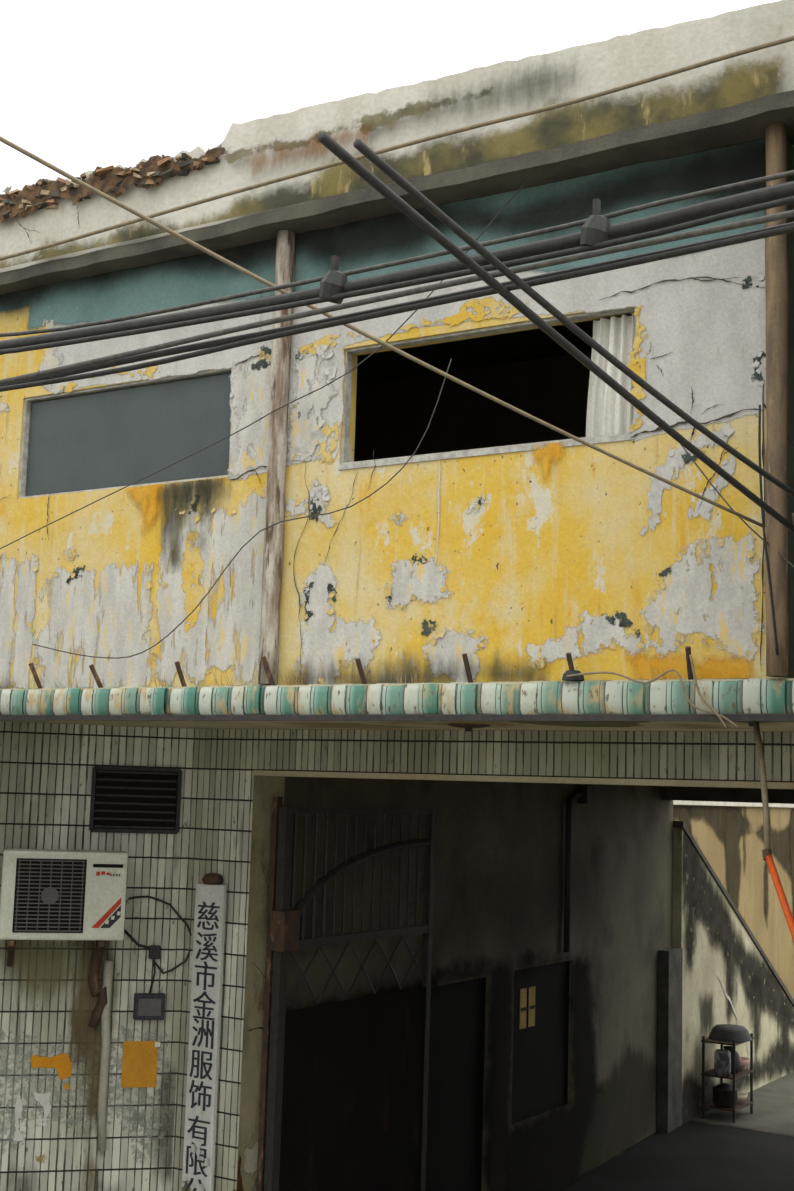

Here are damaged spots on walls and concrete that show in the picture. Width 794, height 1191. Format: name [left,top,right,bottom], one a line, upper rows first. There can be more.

spalling [0,145,228,224]
peeling [399,297,529,332]
peeling [287,332,366,465]
peeling [0,345,271,689]
damp [156,478,223,563]
peeling [285,480,337,527]
peeling [465,494,488,514]
peeling [640,421,736,535]
peeling [296,562,382,685]
peeling [384,553,452,609]
peeling [421,619,489,683]
peeling [524,530,766,670]